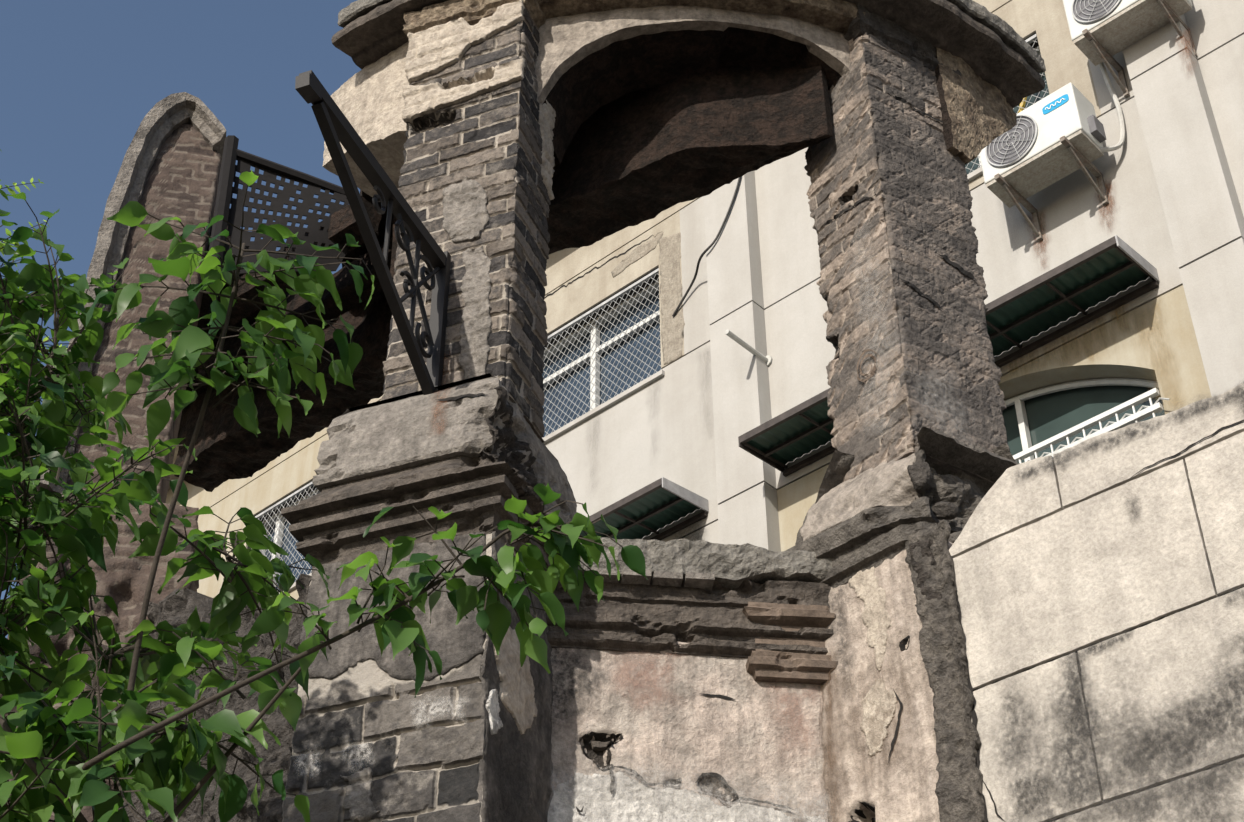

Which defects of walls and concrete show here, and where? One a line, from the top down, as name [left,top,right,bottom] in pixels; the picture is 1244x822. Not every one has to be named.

flaking render [486,626,538,735]
flaking render [547,731,826,822]
spalling [848,501,986,822]
water stain [1017,656,1244,822]